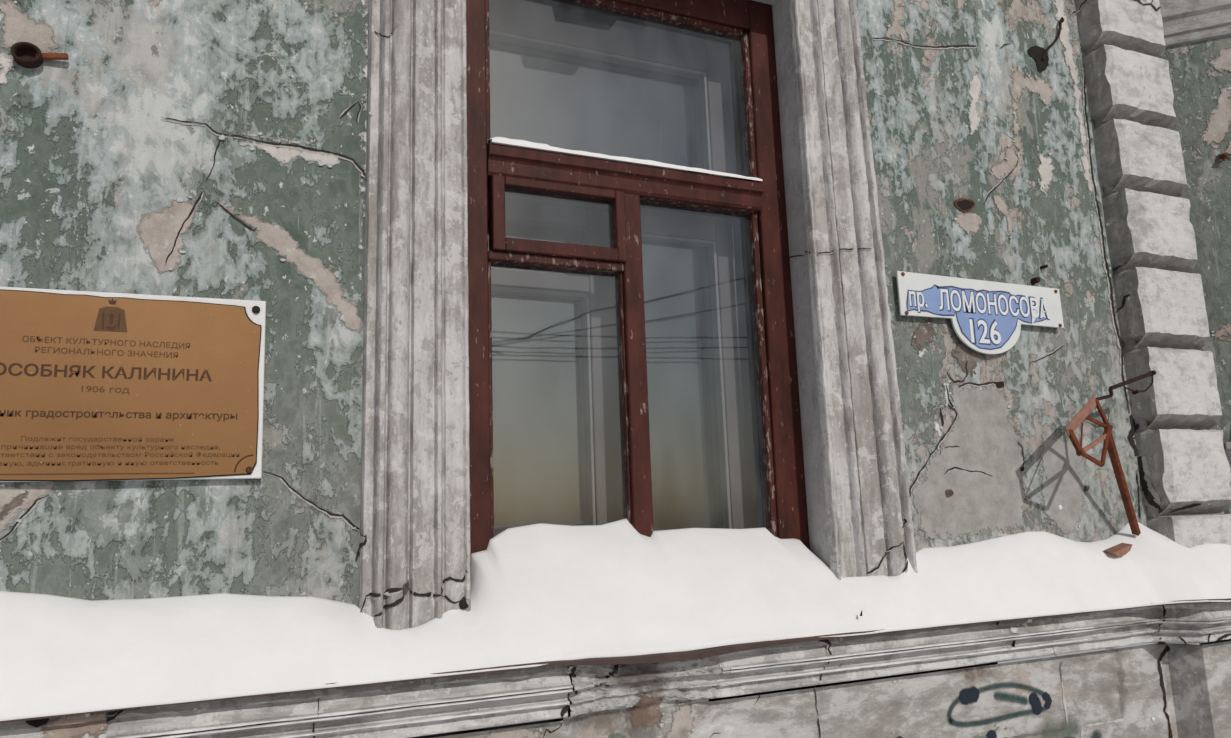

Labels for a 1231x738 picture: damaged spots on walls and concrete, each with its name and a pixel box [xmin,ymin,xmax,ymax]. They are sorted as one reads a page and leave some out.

peeling [0,0,60,84]
peeling [219,131,340,168]
peeling [135,195,199,274]
peeling [217,199,363,332]